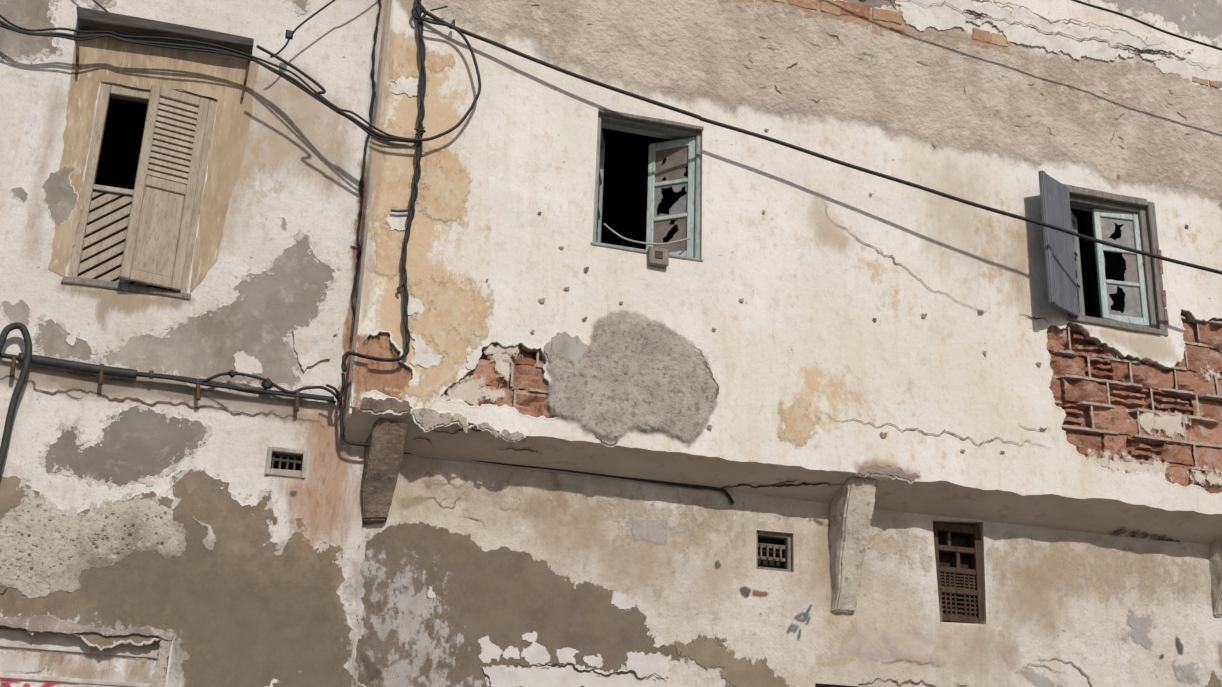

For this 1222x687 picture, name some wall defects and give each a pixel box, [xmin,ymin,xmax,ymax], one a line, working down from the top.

flaking render [0,0,117,66]
flaking render [285,0,314,17]
peeling [380,30,455,101]
flaking render [401,0,1222,211]
flaking render [10,165,79,226]
crack [821,198,989,312]
flaking render [1037,308,1222,496]
flaking render [0,217,381,687]
spalling [482,664,666,687]
flaking render [675,629,795,687]